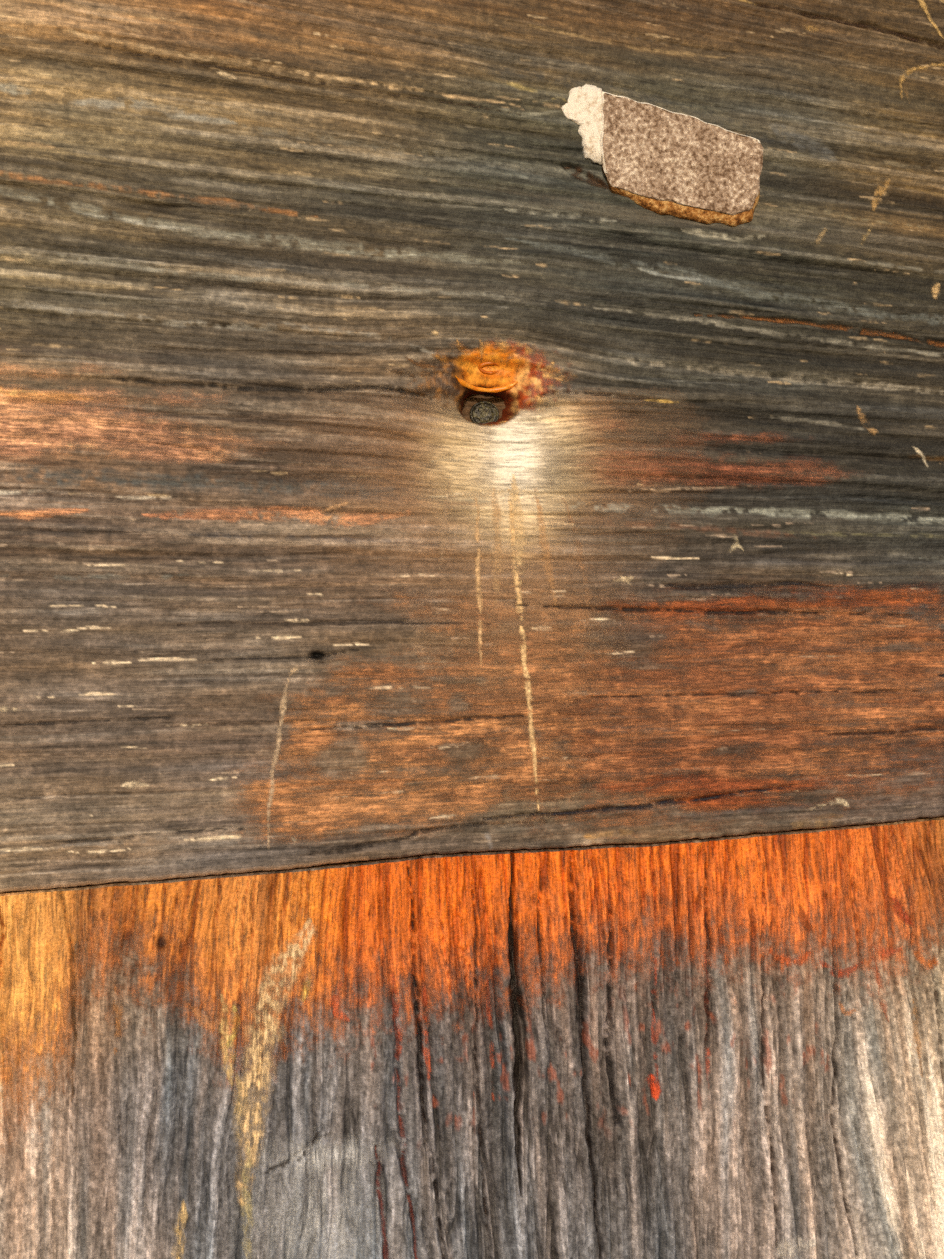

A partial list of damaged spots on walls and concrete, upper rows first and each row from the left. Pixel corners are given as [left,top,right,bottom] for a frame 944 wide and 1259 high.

rust [393,340,561,426]
crack [62,899,77,1129]
crack [308,786,789,1259]
crack [829,984,856,1254]